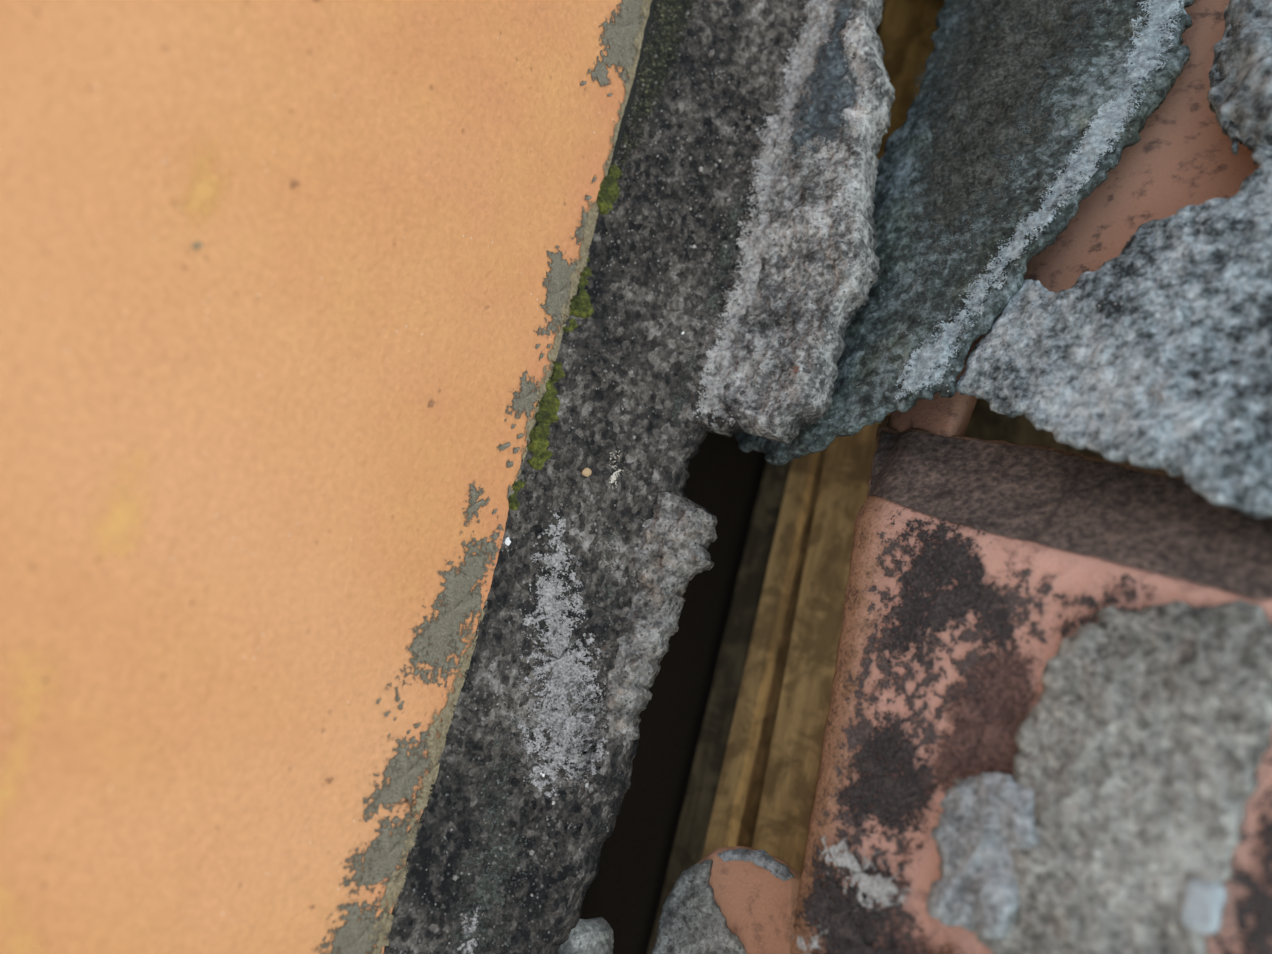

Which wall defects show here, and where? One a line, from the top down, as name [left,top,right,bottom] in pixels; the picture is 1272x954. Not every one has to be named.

peeling [497,0,652,499]
peeling [313,482,505,954]
spalling [603,492,717,740]
leakage [792,430,1272,954]